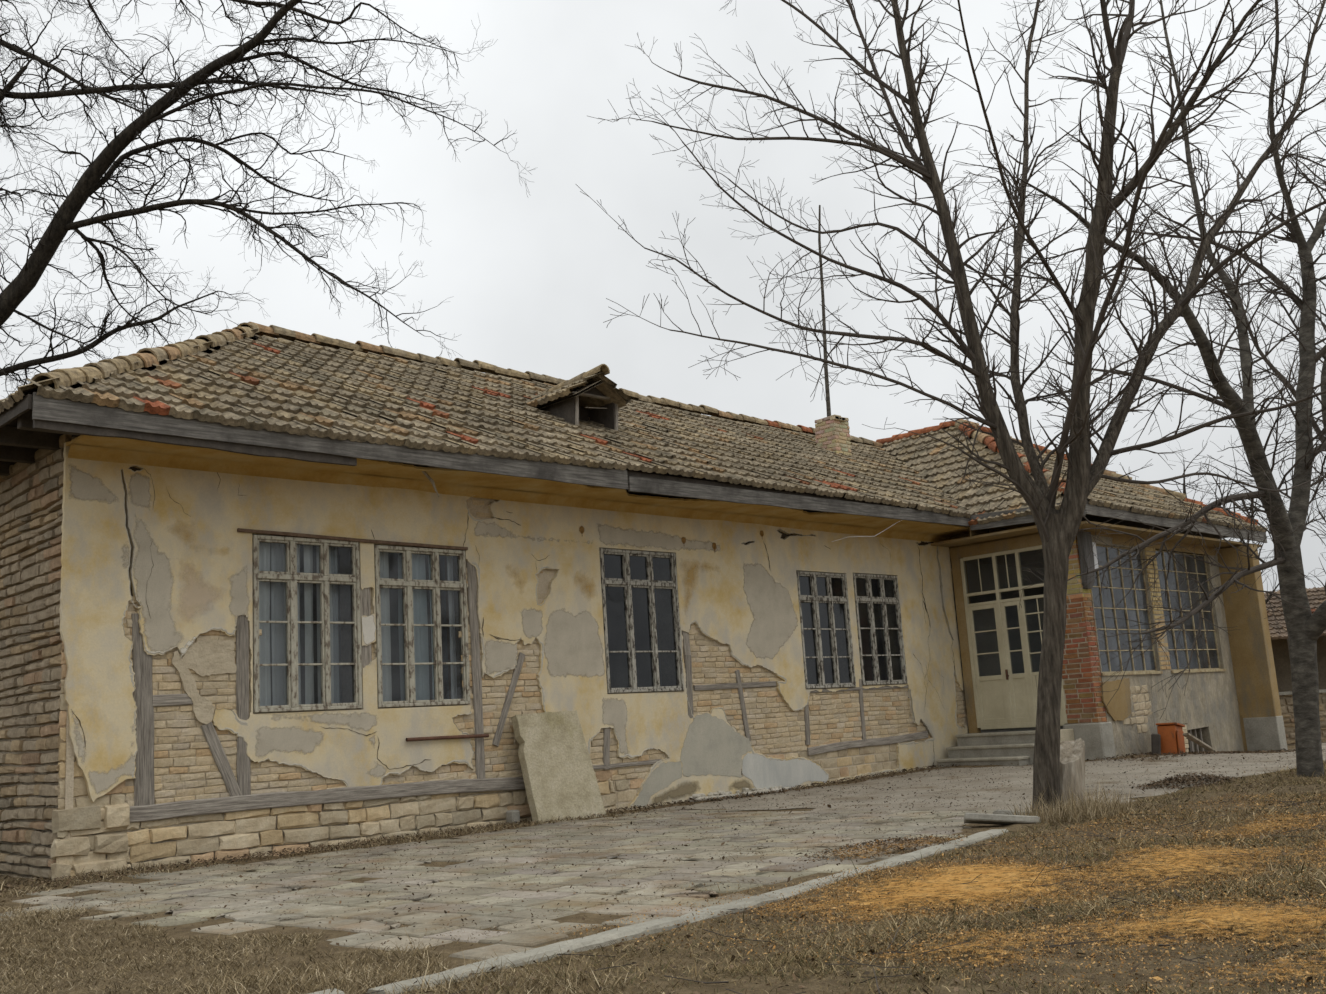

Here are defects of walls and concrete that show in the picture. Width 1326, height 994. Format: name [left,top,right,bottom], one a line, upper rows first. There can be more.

crack [120,469,188,618]
flaking render [74,520,349,806]
flaking render [369,560,605,785]
flaking render [682,564,935,782]